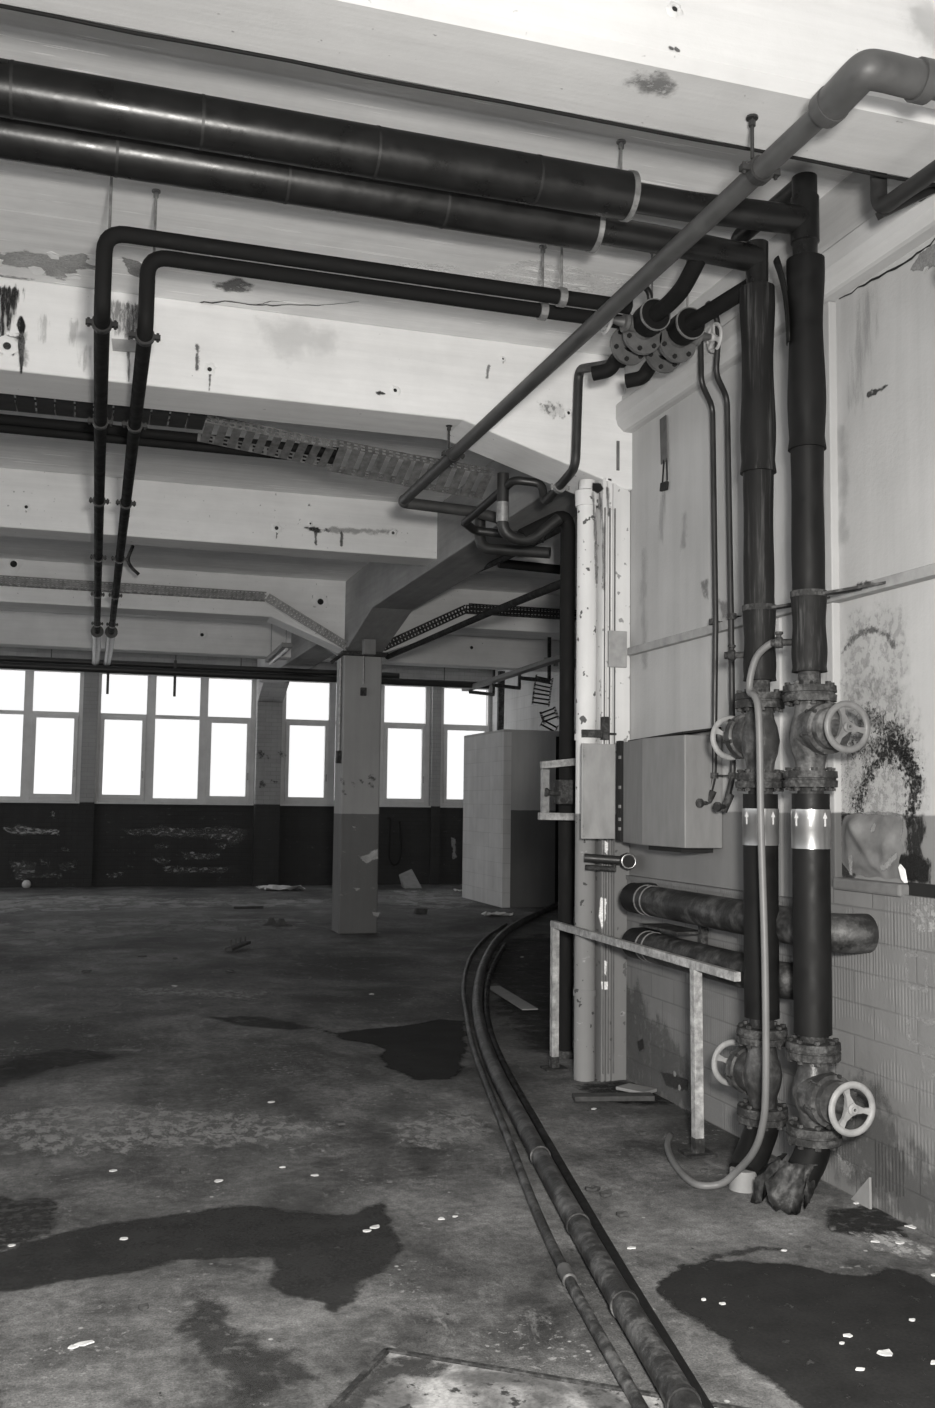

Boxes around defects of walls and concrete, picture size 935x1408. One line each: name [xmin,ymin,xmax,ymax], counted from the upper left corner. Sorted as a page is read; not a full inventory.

peeling [0,251,95,281]
peeling [122,257,141,277]
water stain [0,286,19,335]
water stain [844,626,895,650]
water stain [841,702,931,884]
water stain [0,1050,108,1087]
water stain [218,1016,468,1080]
water stain [0,1196,399,1312]
water stain [656,1247,935,1408]